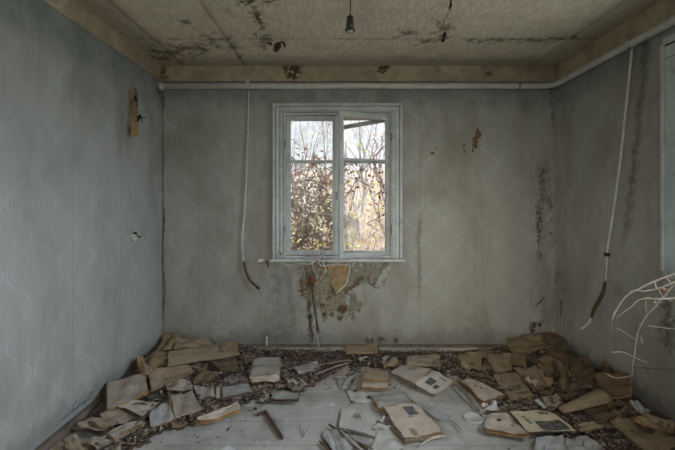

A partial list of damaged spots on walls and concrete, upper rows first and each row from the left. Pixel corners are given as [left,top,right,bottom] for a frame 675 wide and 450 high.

water stain [238,0,286,52]
flaking render [300,262,391,322]